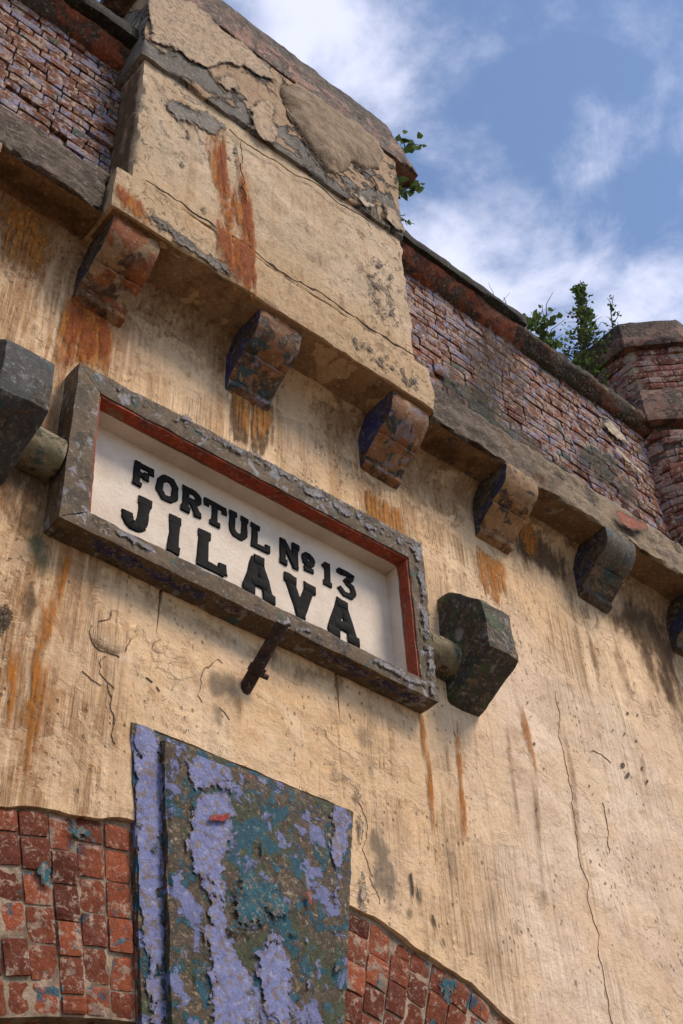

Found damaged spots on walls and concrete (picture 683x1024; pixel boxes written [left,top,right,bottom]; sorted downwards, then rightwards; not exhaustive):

flaking render [250,99,279,143]
corrosion [57,297,119,387]
corrosion [207,133,258,294]
crack [146,180,417,358]
corrosion [230,392,274,456]
corrosion [7,551,72,772]
crack [82,656,115,744]
water stain [611,601,683,708]
peeling [134,724,166,1024]
peeling [179,755,311,1024]
peeling [328,791,380,913]
crack [555,691,613,1024]